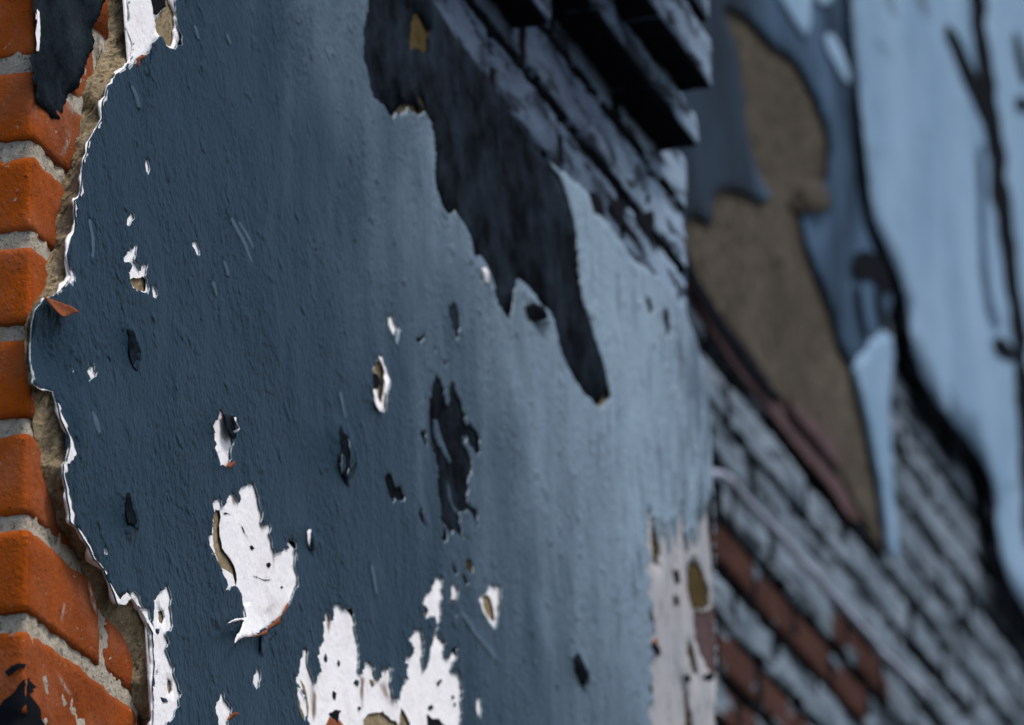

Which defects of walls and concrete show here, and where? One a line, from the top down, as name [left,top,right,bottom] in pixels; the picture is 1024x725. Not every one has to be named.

peeling [779,0,832,40]
spalling [24,0,180,725]
peeling [213,409,240,468]
peeling [420,375,478,542]
peeling [363,0,605,412]
spalling [685,9,899,560]
peeling [209,484,298,657]
peeling [296,559,473,725]
peeling [479,583,500,629]
peeling [646,500,717,725]